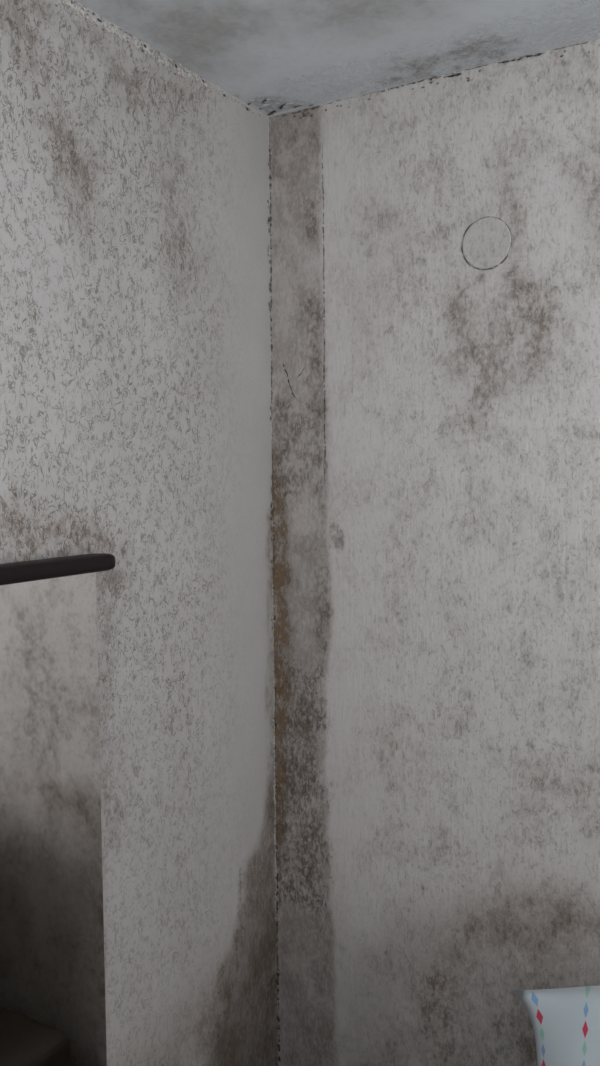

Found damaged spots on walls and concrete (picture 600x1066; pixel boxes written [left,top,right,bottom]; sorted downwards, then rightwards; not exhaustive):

water stain [250,455,323,967]